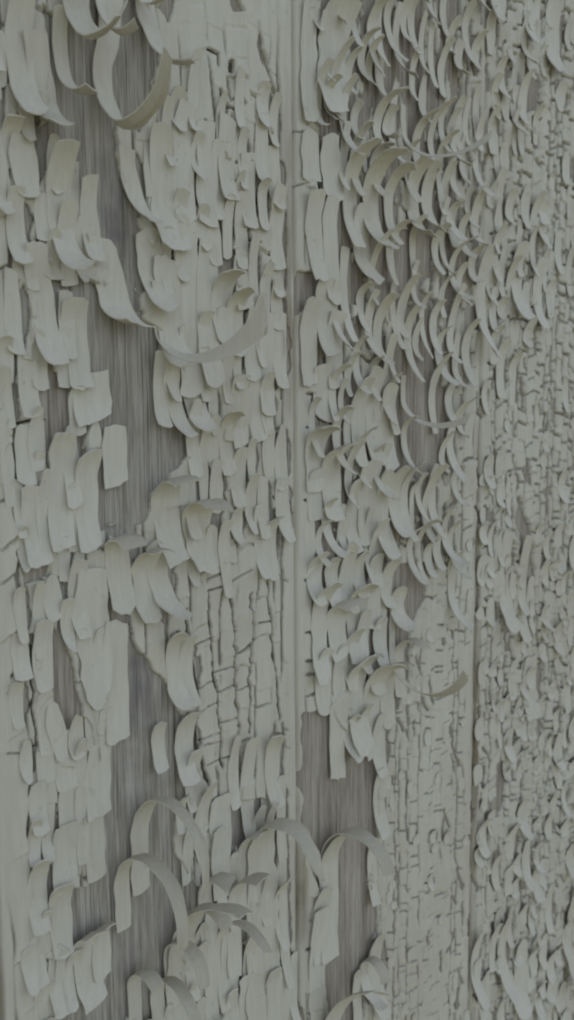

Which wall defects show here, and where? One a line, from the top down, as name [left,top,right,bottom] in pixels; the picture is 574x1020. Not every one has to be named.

peeling [0,0,301,1020]